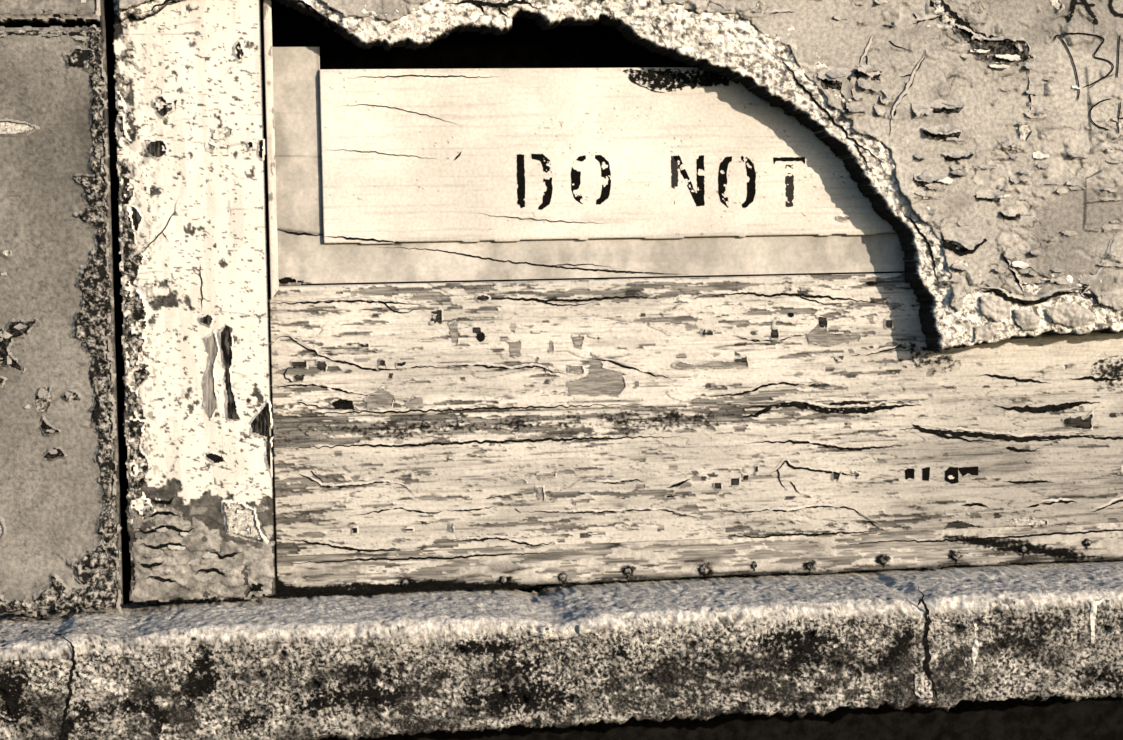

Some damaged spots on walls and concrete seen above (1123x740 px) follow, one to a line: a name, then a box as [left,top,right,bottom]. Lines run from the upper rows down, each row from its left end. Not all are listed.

peeling [0,0,101,20]
flaking render [118,0,182,22]
flaking render [276,0,1123,351]
peeling [115,90,275,602]
peeling [330,342,424,411]
peeling [566,334,639,397]
leakage [1091,354,1123,391]
peeling [1062,410,1094,431]
crack [915,584,938,704]
leakage [1090,599,1110,643]
crack [51,627,82,740]
leakage [79,673,133,699]